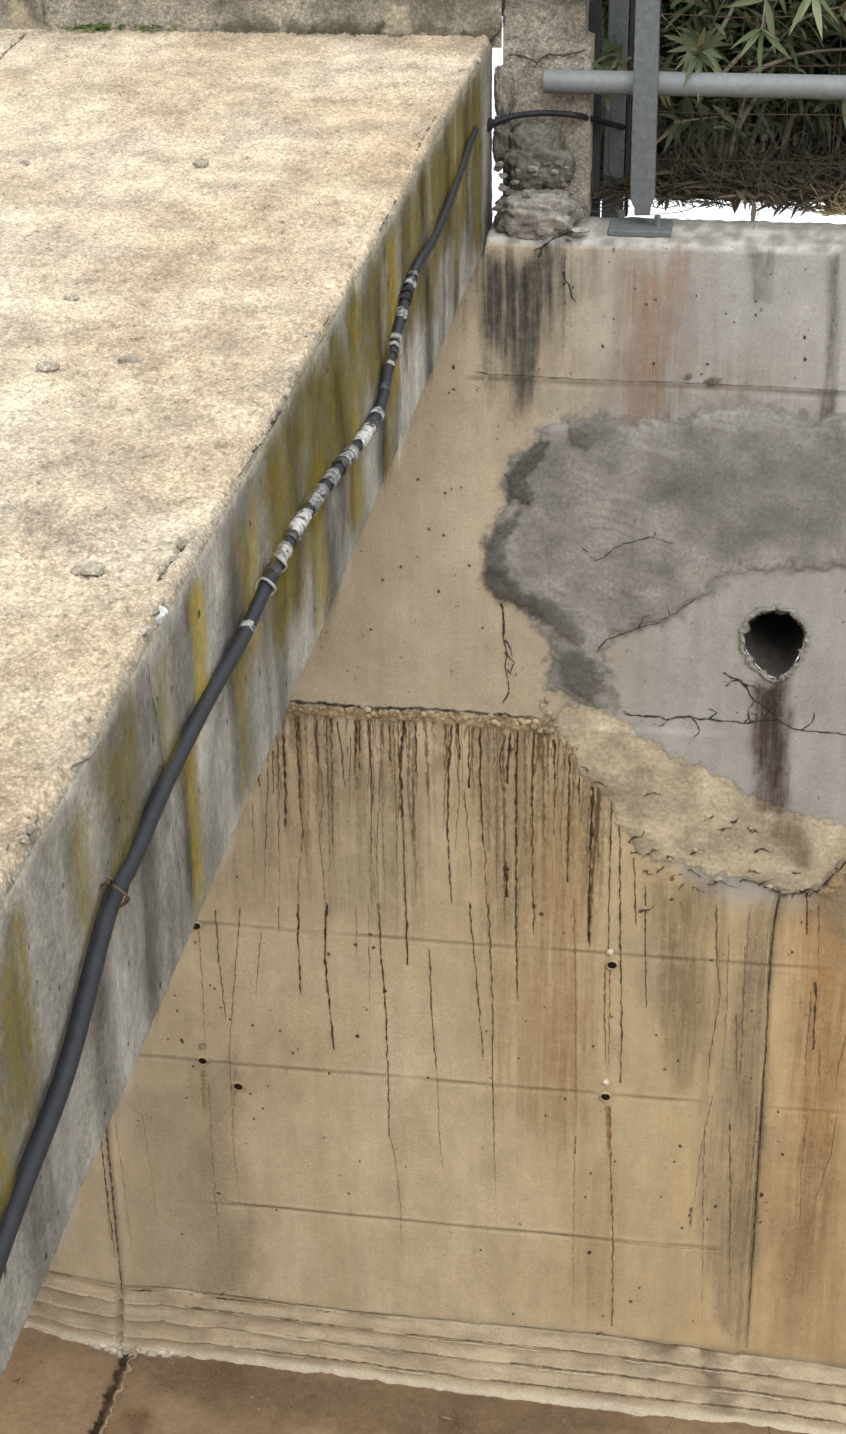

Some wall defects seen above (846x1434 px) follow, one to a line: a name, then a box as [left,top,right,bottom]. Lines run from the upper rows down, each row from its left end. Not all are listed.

crack [582,531,670,561]
leakage [190,582,208,702]
leakage [215,76,662,1212]
crack [597,599,694,652]
crack [626,672,846,737]
leakage [185,744,202,901]
peeling [628,832,821,924]
leakage [805,982,820,1076]
leakage [673,897,762,1333]
rust [606,1106,614,1327]